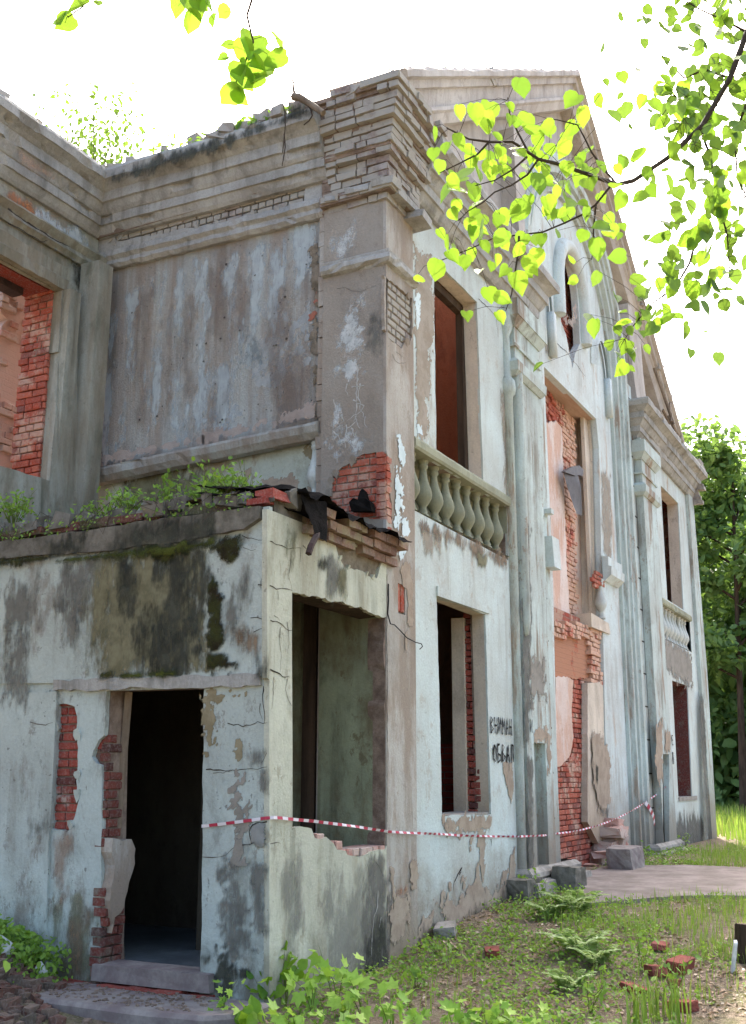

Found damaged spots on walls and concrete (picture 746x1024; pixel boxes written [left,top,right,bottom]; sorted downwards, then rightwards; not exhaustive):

damp [112,105,307,181]
spalling [314,69,448,441]
damp [108,223,316,440]
spalling [545,390,565,435]
damp [2,579,37,707]
damp [50,511,216,677]
damp [225,575,267,678]
flaking render [325,434,414,650]
flaking render [55,704,81,830]
flaking render [199,688,247,757]
crack [206,755,266,773]
flaking render [386,811,516,945]